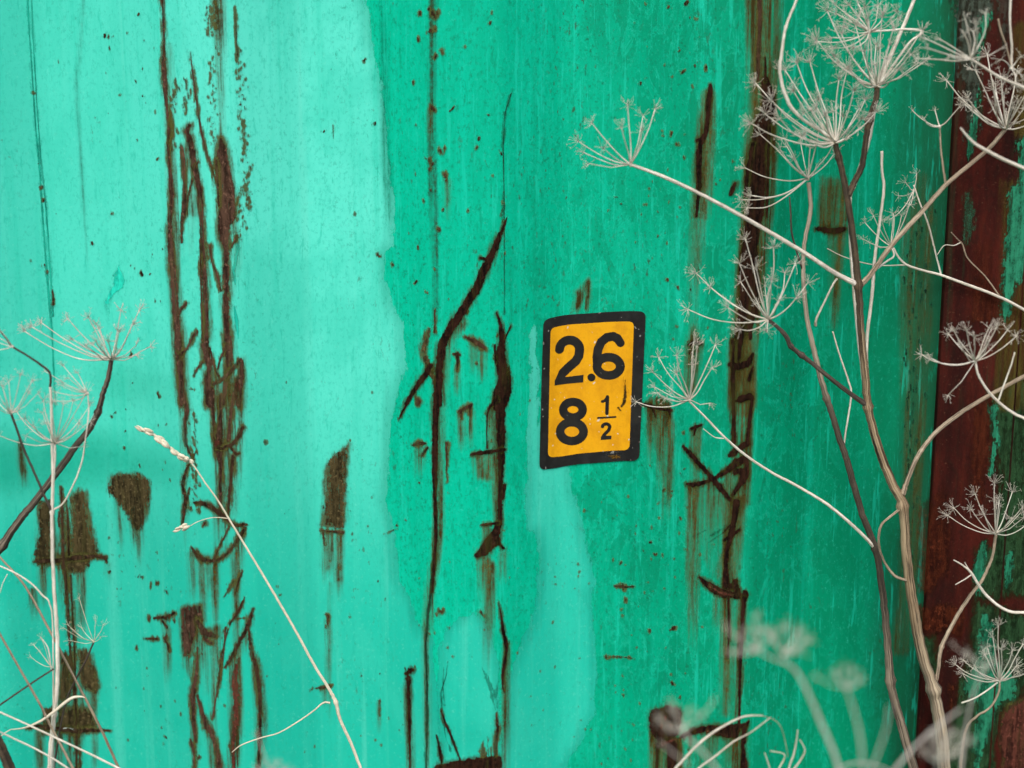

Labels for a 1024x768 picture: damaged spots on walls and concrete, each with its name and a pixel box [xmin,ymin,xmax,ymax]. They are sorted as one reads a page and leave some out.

corrosion [233,5,254,239]
corrosion [452,334,487,379]
corrosion [457,402,493,443]
corrosion [642,0,781,602]
corrosion [29,486,111,621]
corrosion [108,464,152,548]
corrosion [135,412,248,768]
corrosion [319,439,353,581]
corrosion [911,466,966,673]
corrosion [25,647,112,768]
corrosion [399,561,508,768]
corrosion [650,733,691,768]